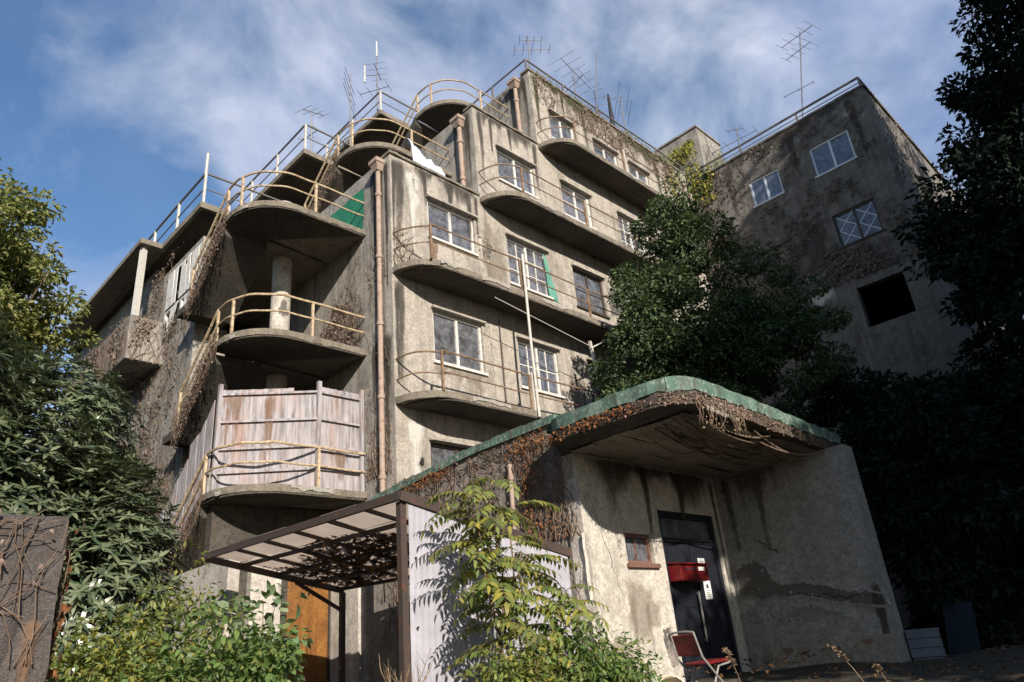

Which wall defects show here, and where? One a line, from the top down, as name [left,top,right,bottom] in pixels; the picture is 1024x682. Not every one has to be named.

damp [639,468,652,528]
damp [709,467,773,578]